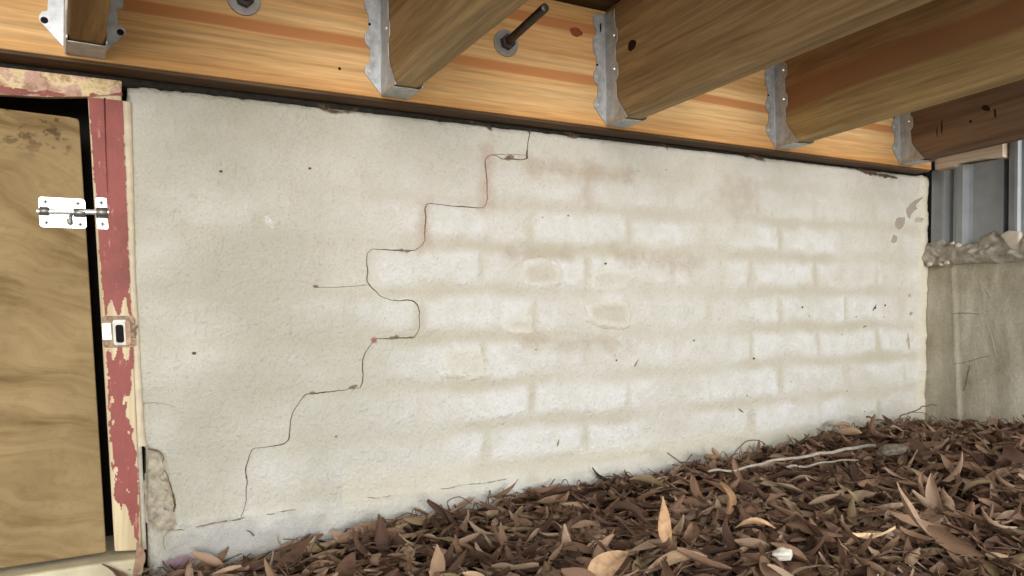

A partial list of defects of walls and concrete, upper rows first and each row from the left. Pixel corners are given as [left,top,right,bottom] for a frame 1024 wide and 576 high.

peeling [88,92,133,316]
peeling [106,347,177,543]
crack [163,130,530,550]